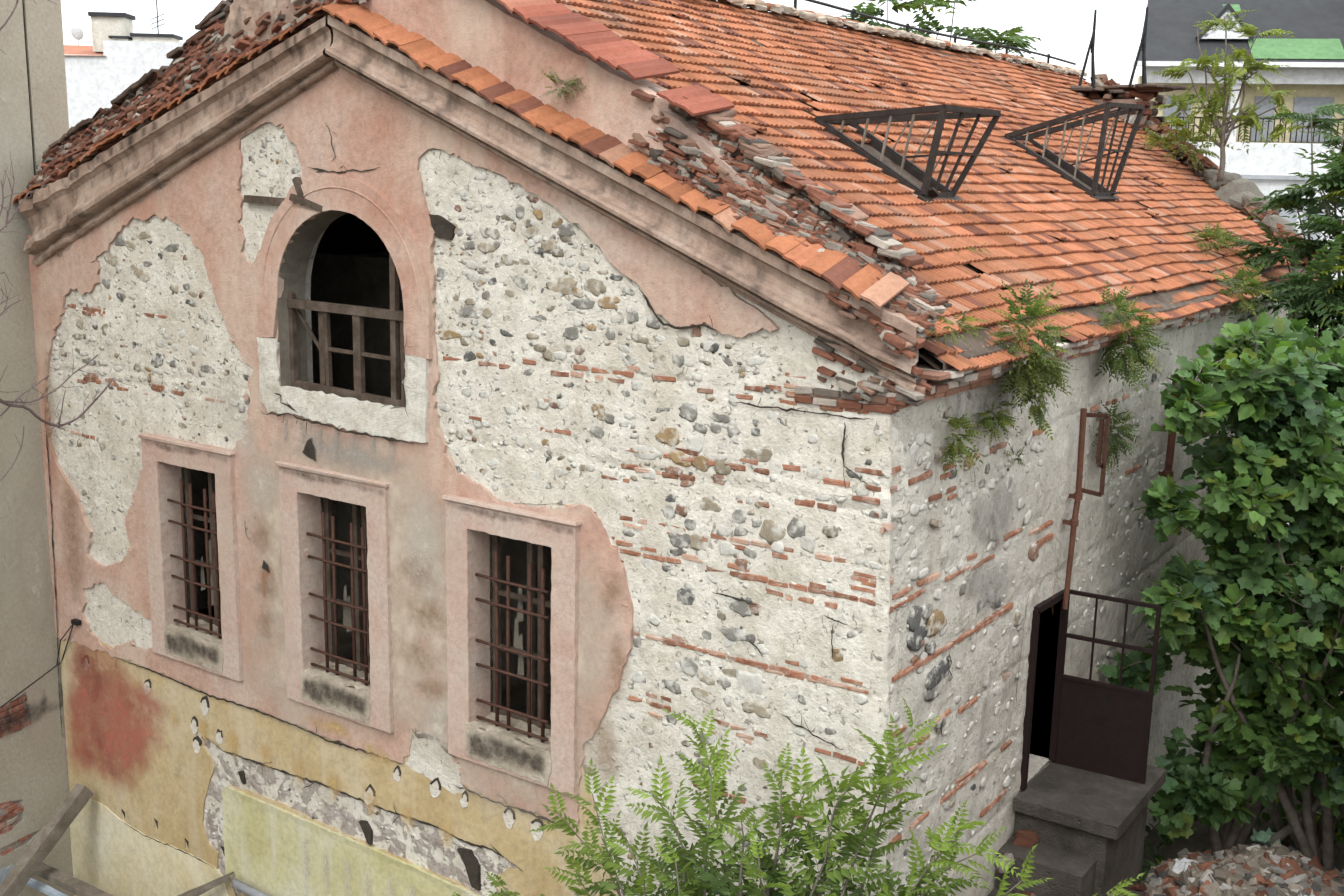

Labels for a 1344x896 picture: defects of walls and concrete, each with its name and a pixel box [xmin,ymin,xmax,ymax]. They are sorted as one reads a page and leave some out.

peeling [235,123,303,264]
peeling [46,215,254,566]
peeling [0,693,31,738]
peeling [0,800,37,884]
peeling [84,582,152,650]
spalling [190,696,520,896]
peeling [419,149,1054,896]
peeling [1073,343,1174,673]